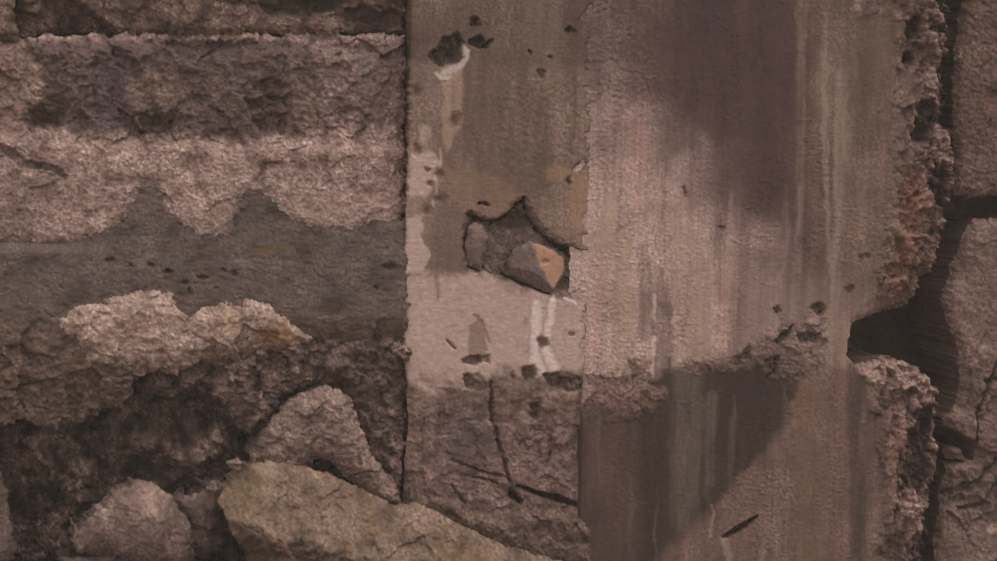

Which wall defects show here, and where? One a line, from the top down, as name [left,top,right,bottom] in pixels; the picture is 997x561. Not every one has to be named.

spalling [901,0,954,219]
peeling [378,141,673,419]
damp [527,0,914,561]
spalling [677,301,831,385]
crack [449,380,578,508]
spalling [527,398,543,424]
crack [932,360,997,464]